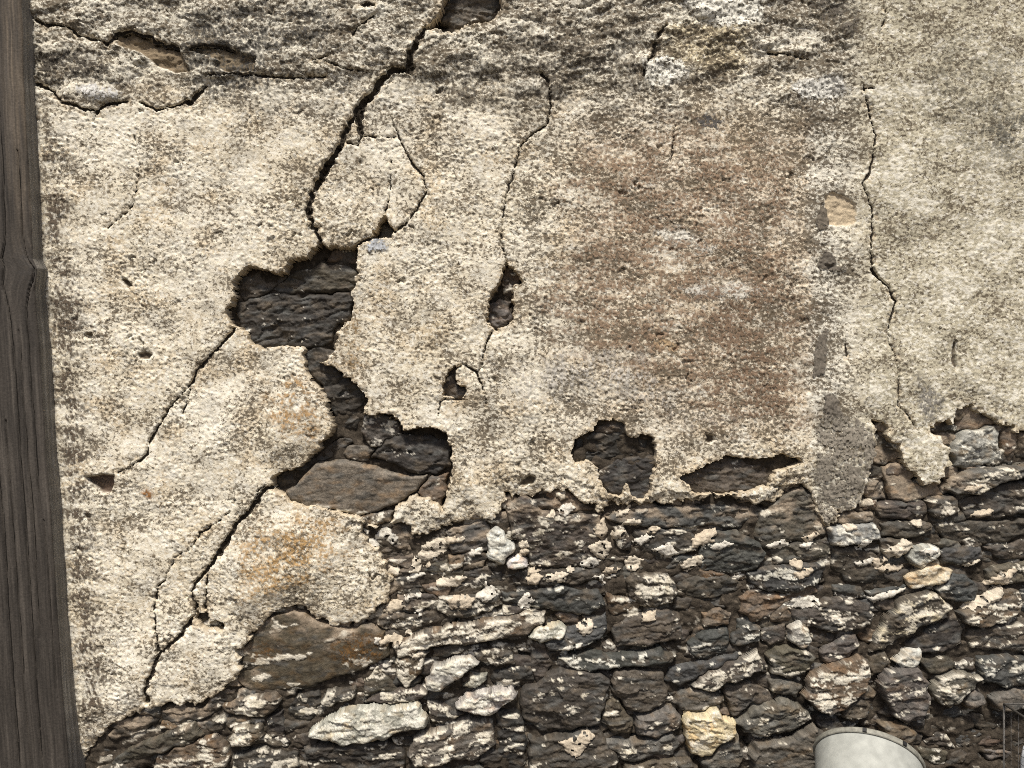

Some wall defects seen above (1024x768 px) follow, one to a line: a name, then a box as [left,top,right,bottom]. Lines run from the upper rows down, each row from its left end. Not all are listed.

crack [352,2,374,35]
crack [500,73,552,255]
crack [861,2,914,425]
crack [118,327,237,473]
crack [438,332,492,416]
flaking render [224,240,803,619]
flaking render [87,474,115,494]
flaking render [766,483,939,580]
crack [144,485,274,701]
flaking render [782,595,820,610]
flaking render [959,568,1018,611]
flaking render [558,726,595,759]